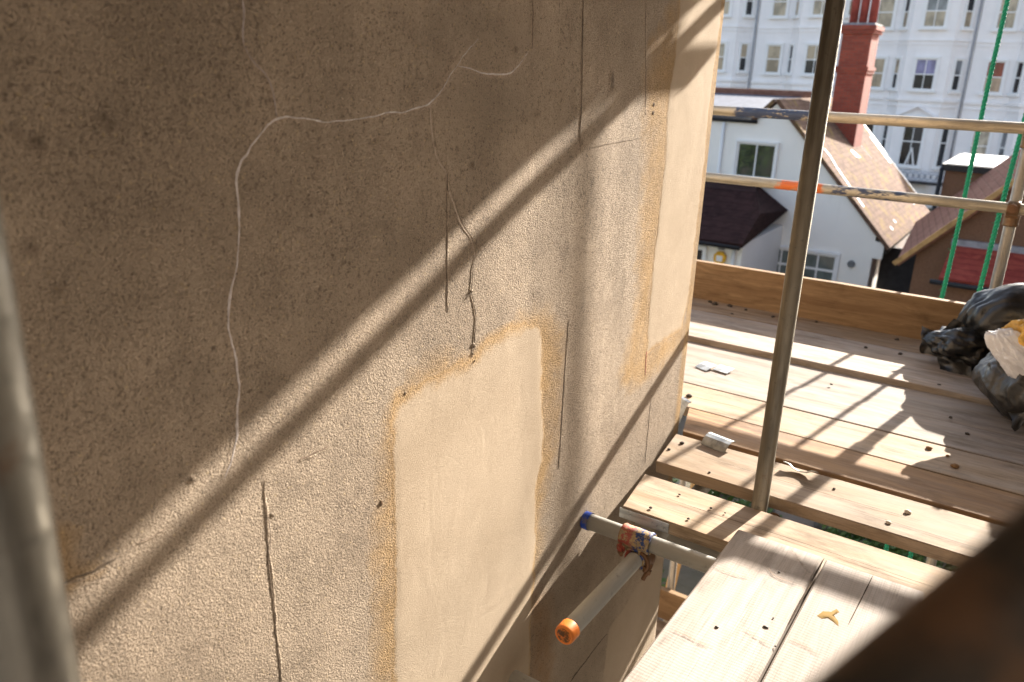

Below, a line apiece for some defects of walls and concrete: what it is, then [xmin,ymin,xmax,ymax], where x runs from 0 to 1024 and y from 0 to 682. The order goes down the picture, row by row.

crack [580,7,639,151]
crack [221,0,534,480]
crack [558,322,569,468]
crack [263,481,283,682]